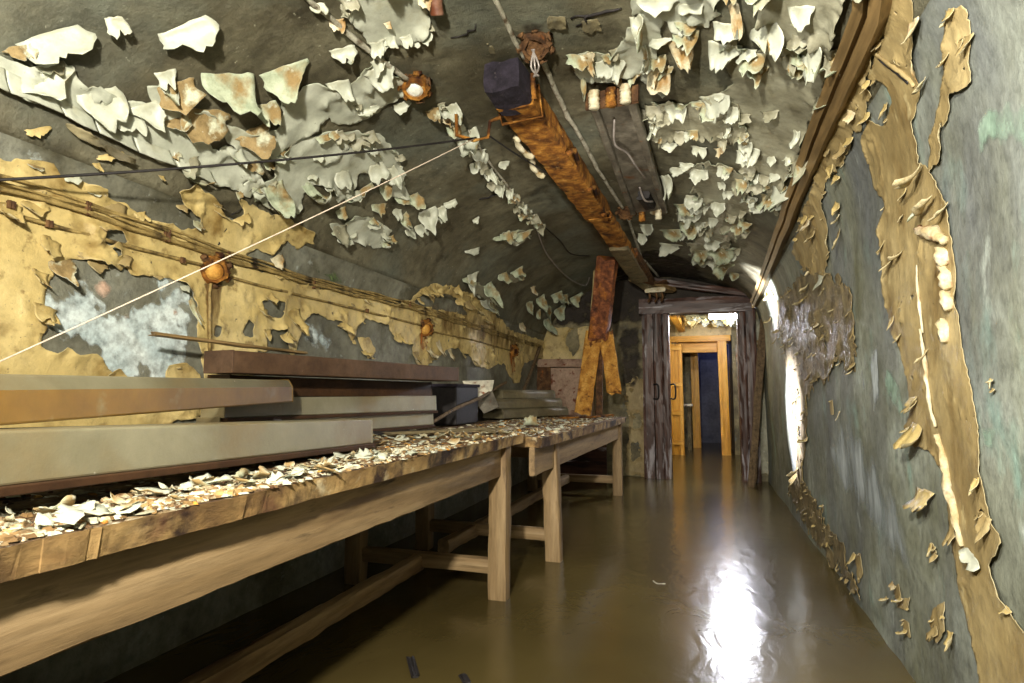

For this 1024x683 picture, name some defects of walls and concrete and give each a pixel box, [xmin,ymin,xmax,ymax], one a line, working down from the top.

peeling [0,409,201,428]
peeling [0,0,589,384]
corrosion [513,134,546,179]
peeling [566,0,1024,683]